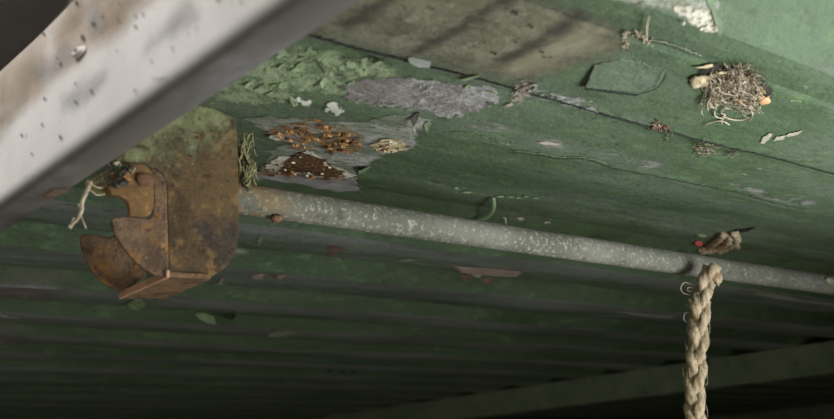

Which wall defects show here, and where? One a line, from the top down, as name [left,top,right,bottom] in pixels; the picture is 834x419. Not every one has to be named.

crack [307,34,410,63]
damp [313,0,621,81]
crack [632,35,703,57]
peeling [615,0,723,37]
corrosion [243,113,431,192]
peeling [204,45,500,132]
crack [450,131,808,210]
crack [430,65,834,175]